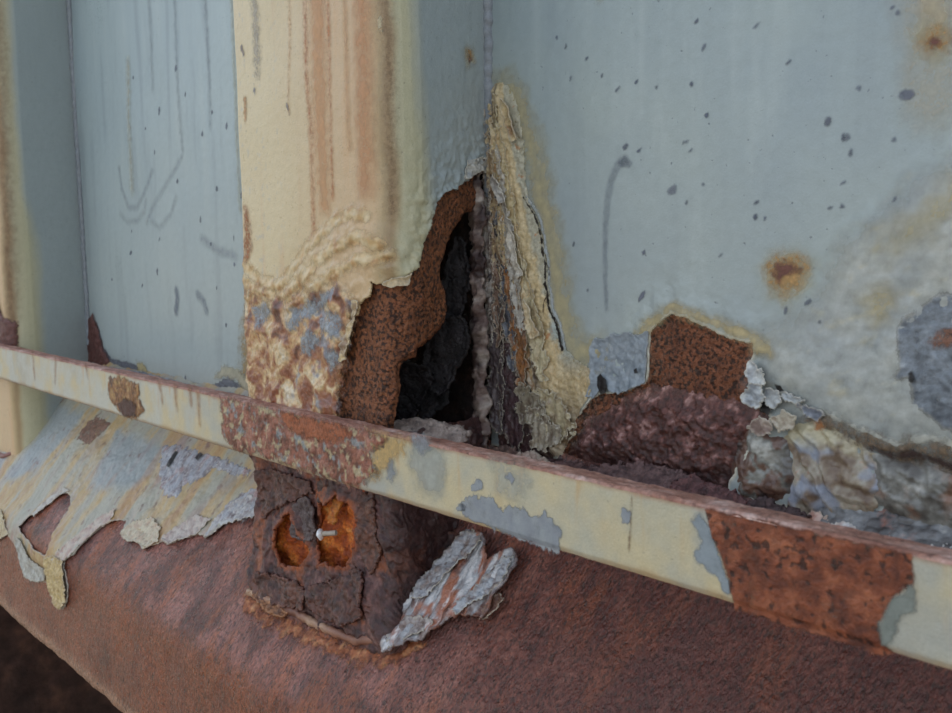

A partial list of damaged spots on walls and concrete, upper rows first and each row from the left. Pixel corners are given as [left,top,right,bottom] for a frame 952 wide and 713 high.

corrosion [0,310,19,346]
corrosion [87,313,109,365]
peeling [92,362,248,396]
crack [523,196,566,351]
peeling [336,82,952,549]
corrosion [766,254,810,296]
corrosion [219,396,406,489]
corrosion [487,445,554,463]
peeling [0,398,257,610]
corrosion [568,382,914,656]
peeling [243,479,562,670]